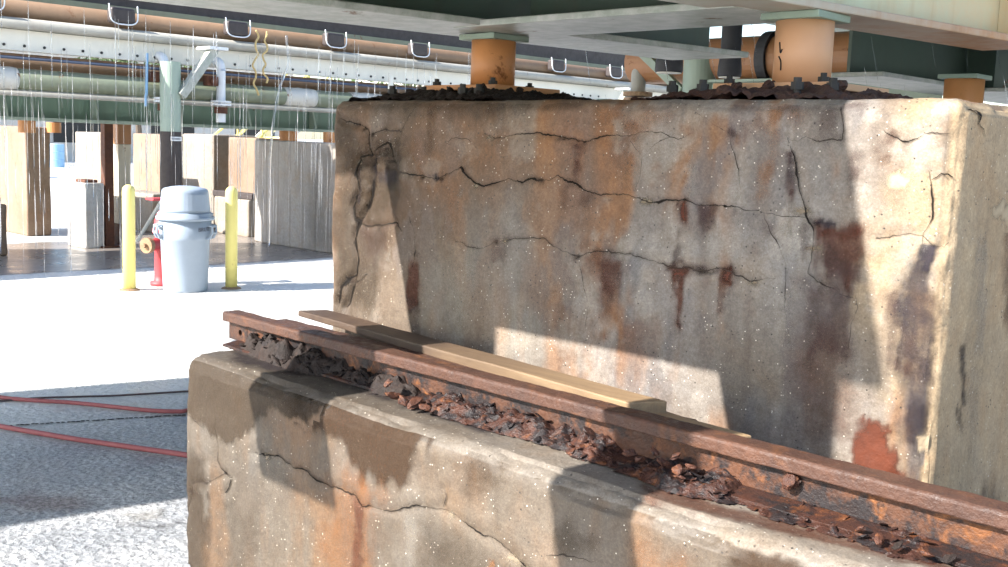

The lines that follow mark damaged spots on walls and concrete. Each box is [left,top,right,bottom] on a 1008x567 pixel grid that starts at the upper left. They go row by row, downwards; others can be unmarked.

crack [885,132,949,142]
rust [406,263,419,312]
crack [338,108,858,340]
rust [667,264,689,329]
rust [814,219,863,293]
crack [879,170,953,254]
water stain [235,353,300,375]
water stain [895,244,937,443]
water stain [11,360,433,488]
rust [852,417,903,476]
crack [255,452,599,567]
rust [644,486,870,550]